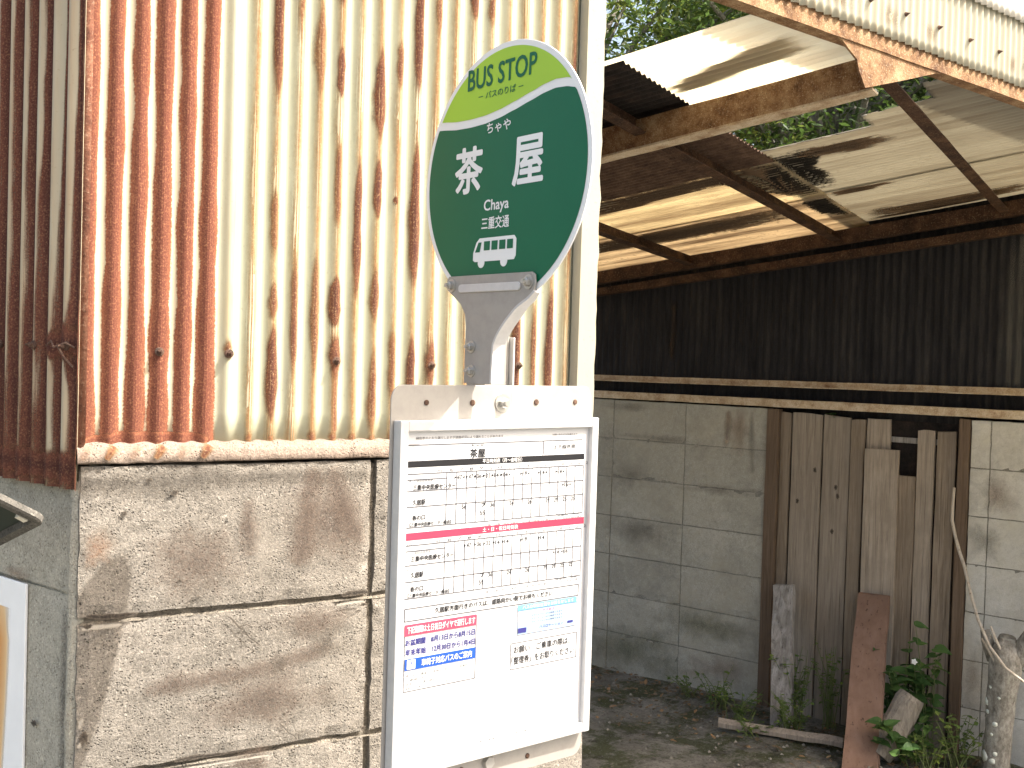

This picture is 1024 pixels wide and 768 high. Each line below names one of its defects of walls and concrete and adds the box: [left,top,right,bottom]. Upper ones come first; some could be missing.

rust [0,0,232,491]
rust [245,0,285,442]
rust [286,0,496,441]
rust [511,250,570,386]
rust [508,0,578,72]
damp [150,610,343,721]